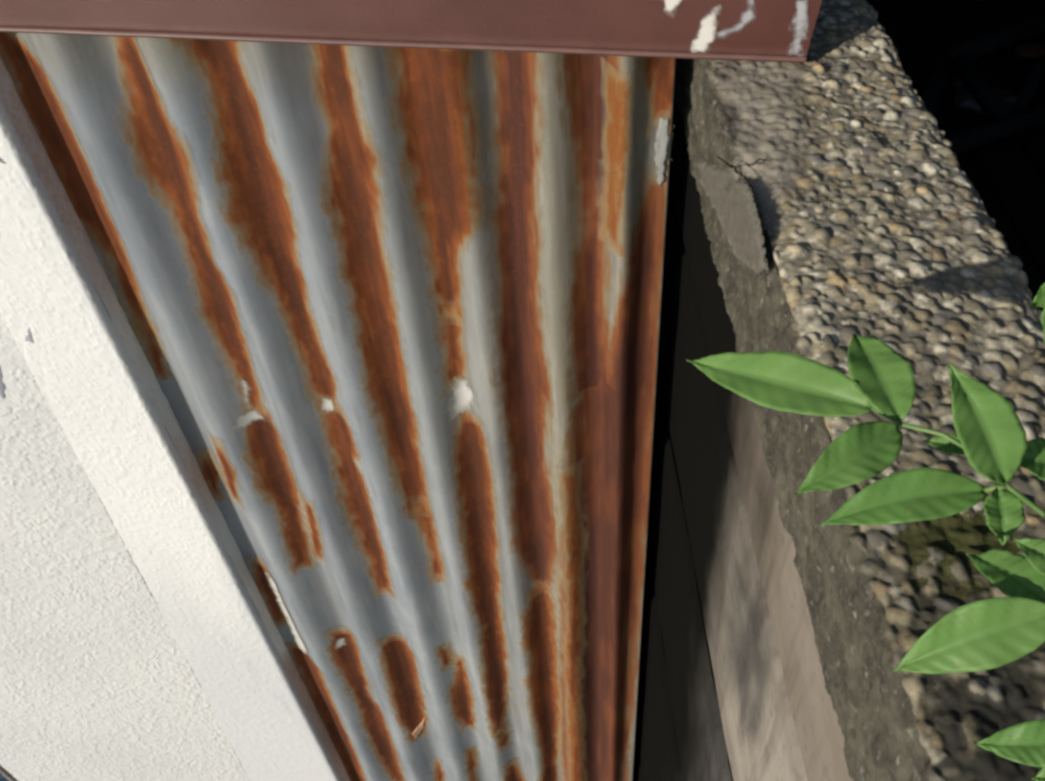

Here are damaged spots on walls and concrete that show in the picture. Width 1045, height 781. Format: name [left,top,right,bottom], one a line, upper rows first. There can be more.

corrosion [0,32,170,381]
corrosion [114,36,395,599]
corrosion [311,44,445,583]
corrosion [385,47,675,781]
crack [716,156,772,202]
corrosion [250,556,290,626]
corrosion [286,642,366,781]
corrosion [325,627,428,781]